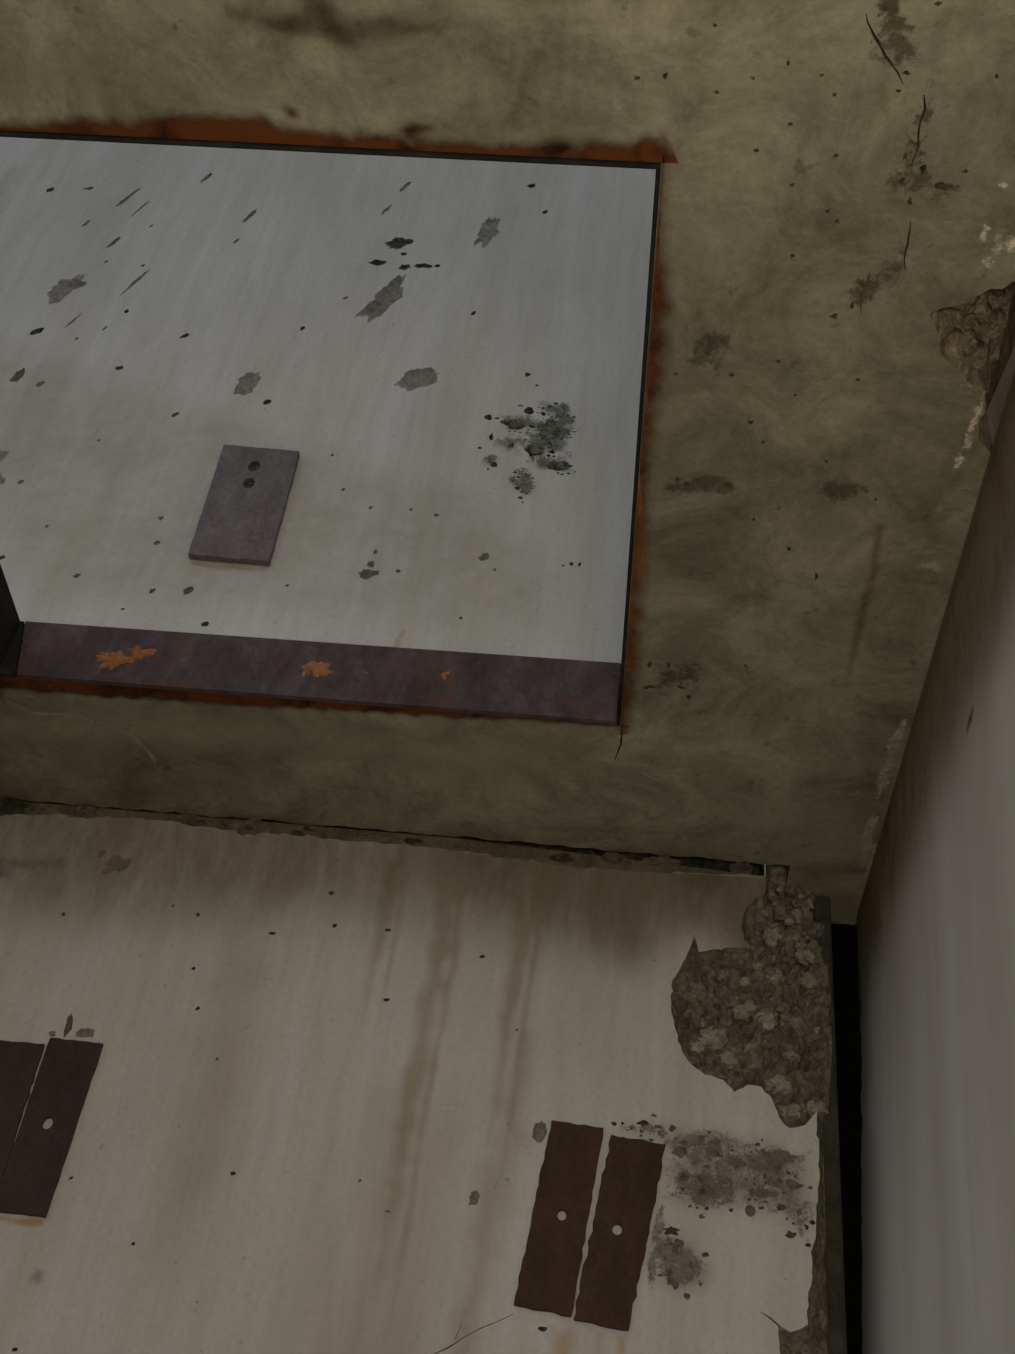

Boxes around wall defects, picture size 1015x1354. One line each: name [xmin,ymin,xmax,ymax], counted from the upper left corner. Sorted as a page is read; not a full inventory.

rust [0,109,678,735]
spalling [930,282,1015,444]
spalling [611,864,832,1354]